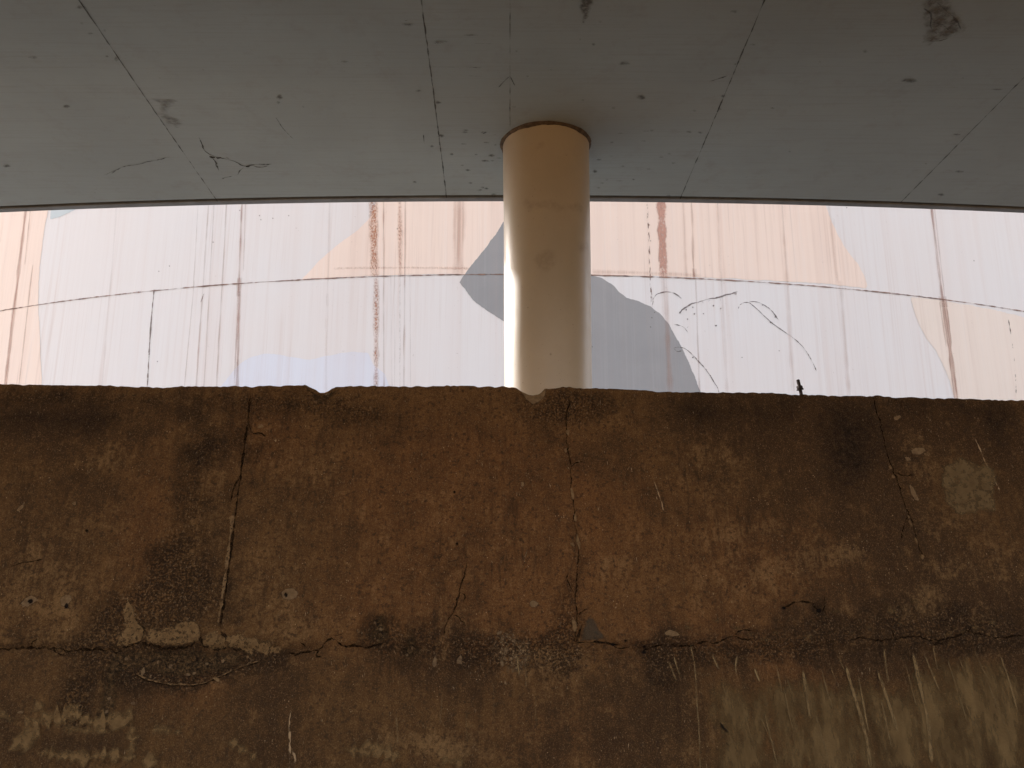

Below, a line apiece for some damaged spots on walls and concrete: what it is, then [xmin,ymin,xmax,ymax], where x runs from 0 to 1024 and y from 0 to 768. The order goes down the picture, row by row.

crack [200,140,269,179]
corrosion [647,202,667,298]
crack [0,398,265,687]
crack [564,398,751,652]
crack [873,398,924,559]
peeling [117,599,281,656]
crack [289,634,383,658]
crack [444,565,467,634]
crack [850,626,1023,645]
water stain [713,647,1024,768]